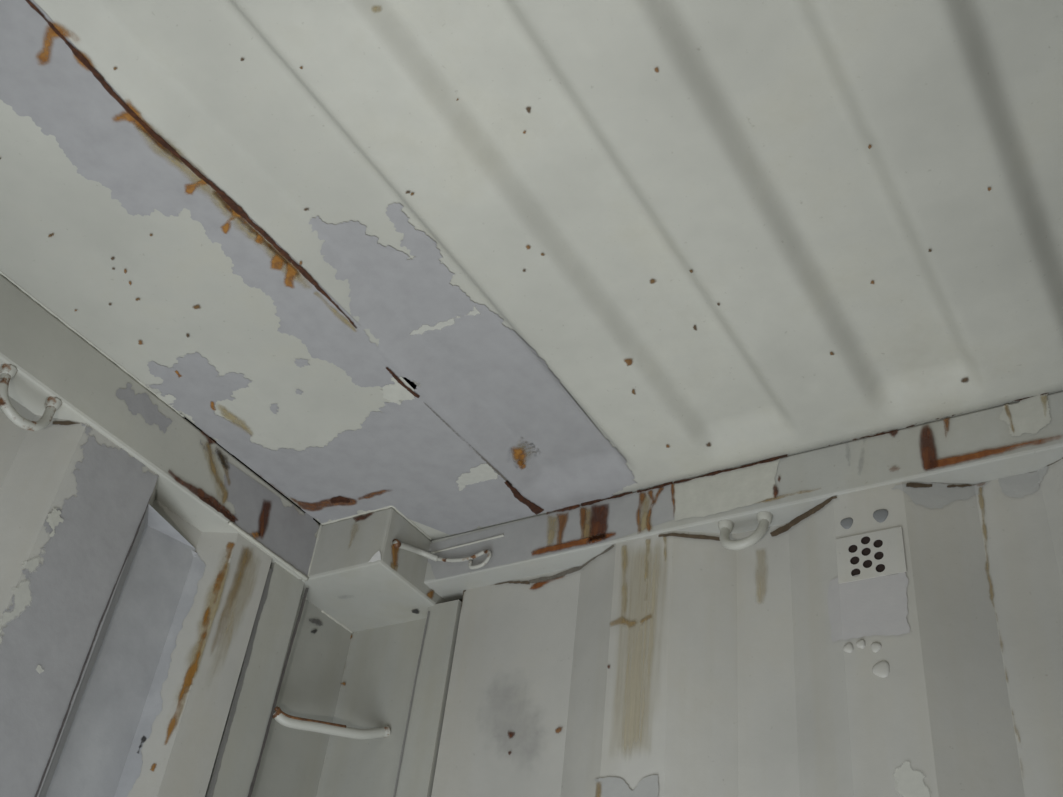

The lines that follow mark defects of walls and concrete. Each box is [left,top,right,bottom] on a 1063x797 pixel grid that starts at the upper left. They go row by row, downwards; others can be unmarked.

rust [25,0,356,330]
peeling [0,0,780,579]
rust [380,367,420,405]
rust [168,432,237,523]
rust [252,502,271,538]
rust [291,490,387,521]
rust [473,448,788,555]
rust [829,413,1053,470]
peeling [0,423,206,797]
rust [179,542,249,701]